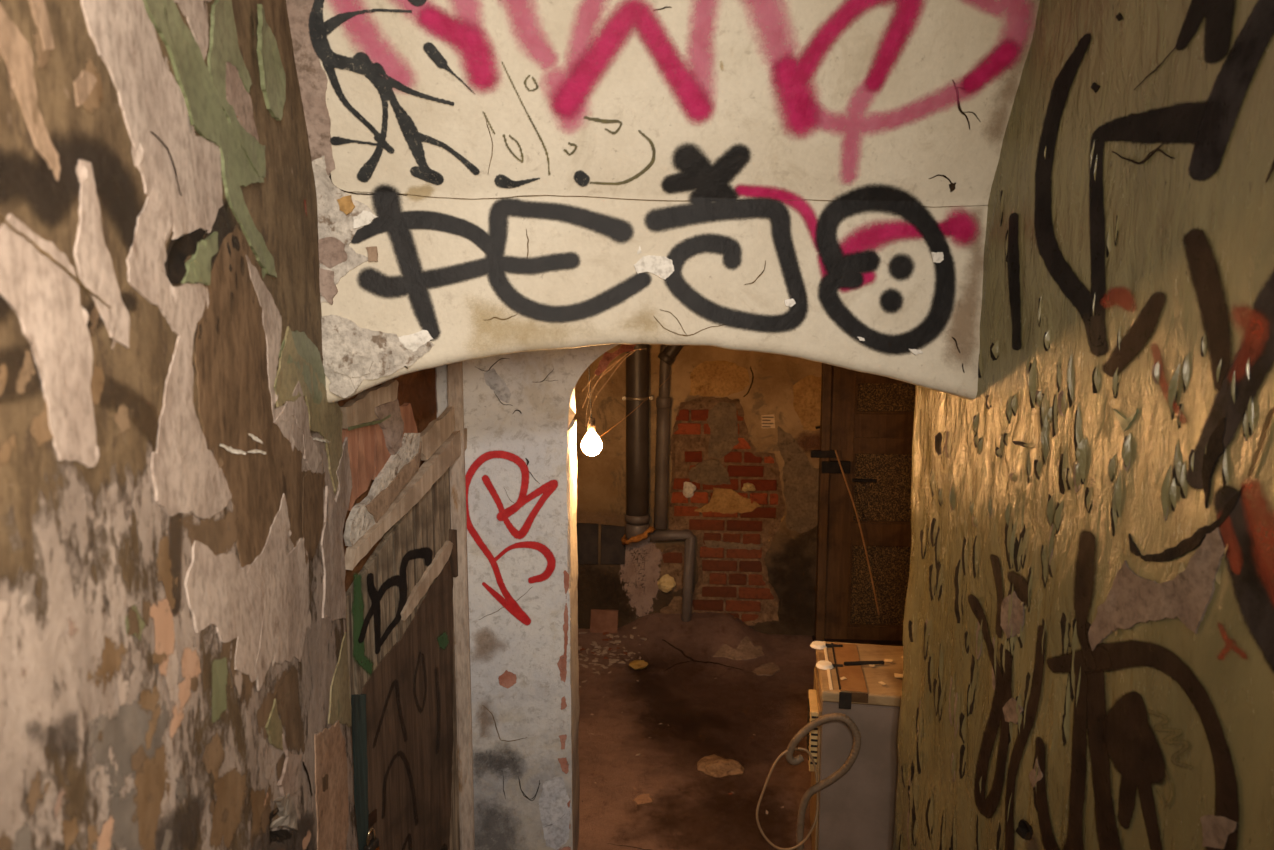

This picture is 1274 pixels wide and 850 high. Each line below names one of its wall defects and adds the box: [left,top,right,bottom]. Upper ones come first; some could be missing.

peeling [1106,213,1119,258]
peeling [0,0,434,850]
flaking render [660,396,786,626]
flaking render [898,292,1244,850]
peeling [1216,358,1254,441]
damp [475,752,520,775]